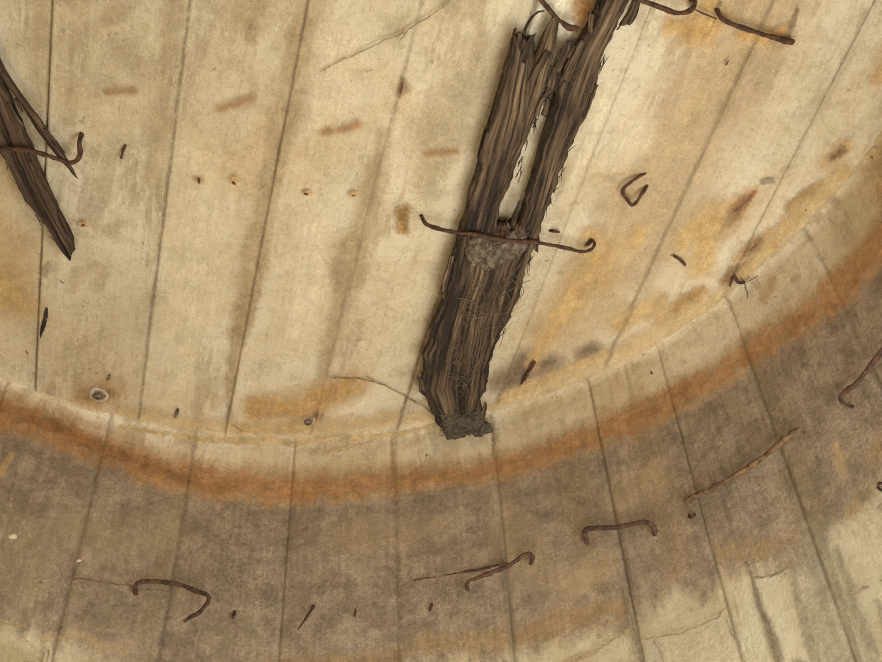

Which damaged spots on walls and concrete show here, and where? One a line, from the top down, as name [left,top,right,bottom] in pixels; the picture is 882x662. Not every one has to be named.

crack [320,0,450,72]
water stain [526,0,593,54]
corrosion [573,0,596,33]
corrosion [665,0,730,46]
corrosion [738,26,789,44]
corrosion [395,205,412,236]
corrosion [673,190,757,276]
corrosion [721,139,882,287]
corrosion [0,222,882,506]
water stain [0,265,882,662]